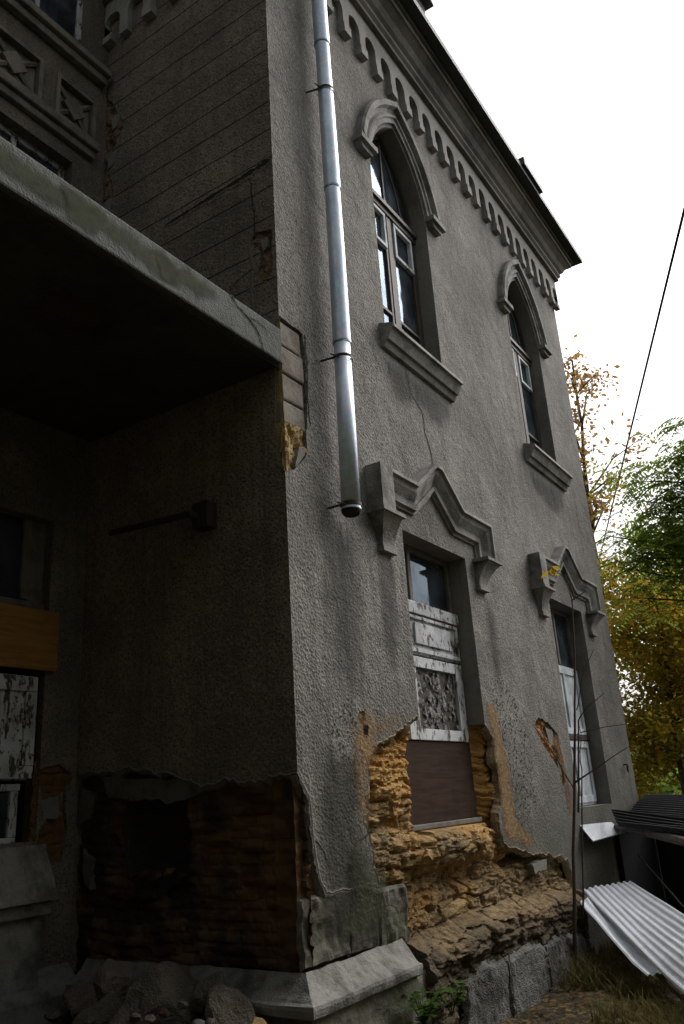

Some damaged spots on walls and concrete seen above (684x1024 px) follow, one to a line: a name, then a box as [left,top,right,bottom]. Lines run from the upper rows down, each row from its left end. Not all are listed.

crack [164,157,271,233]
spalling [253,232,273,284]
spalling [275,318,311,471]
crack [404,366,433,463]
spalling [74,765,359,975]
spalling [332,682,595,1024]